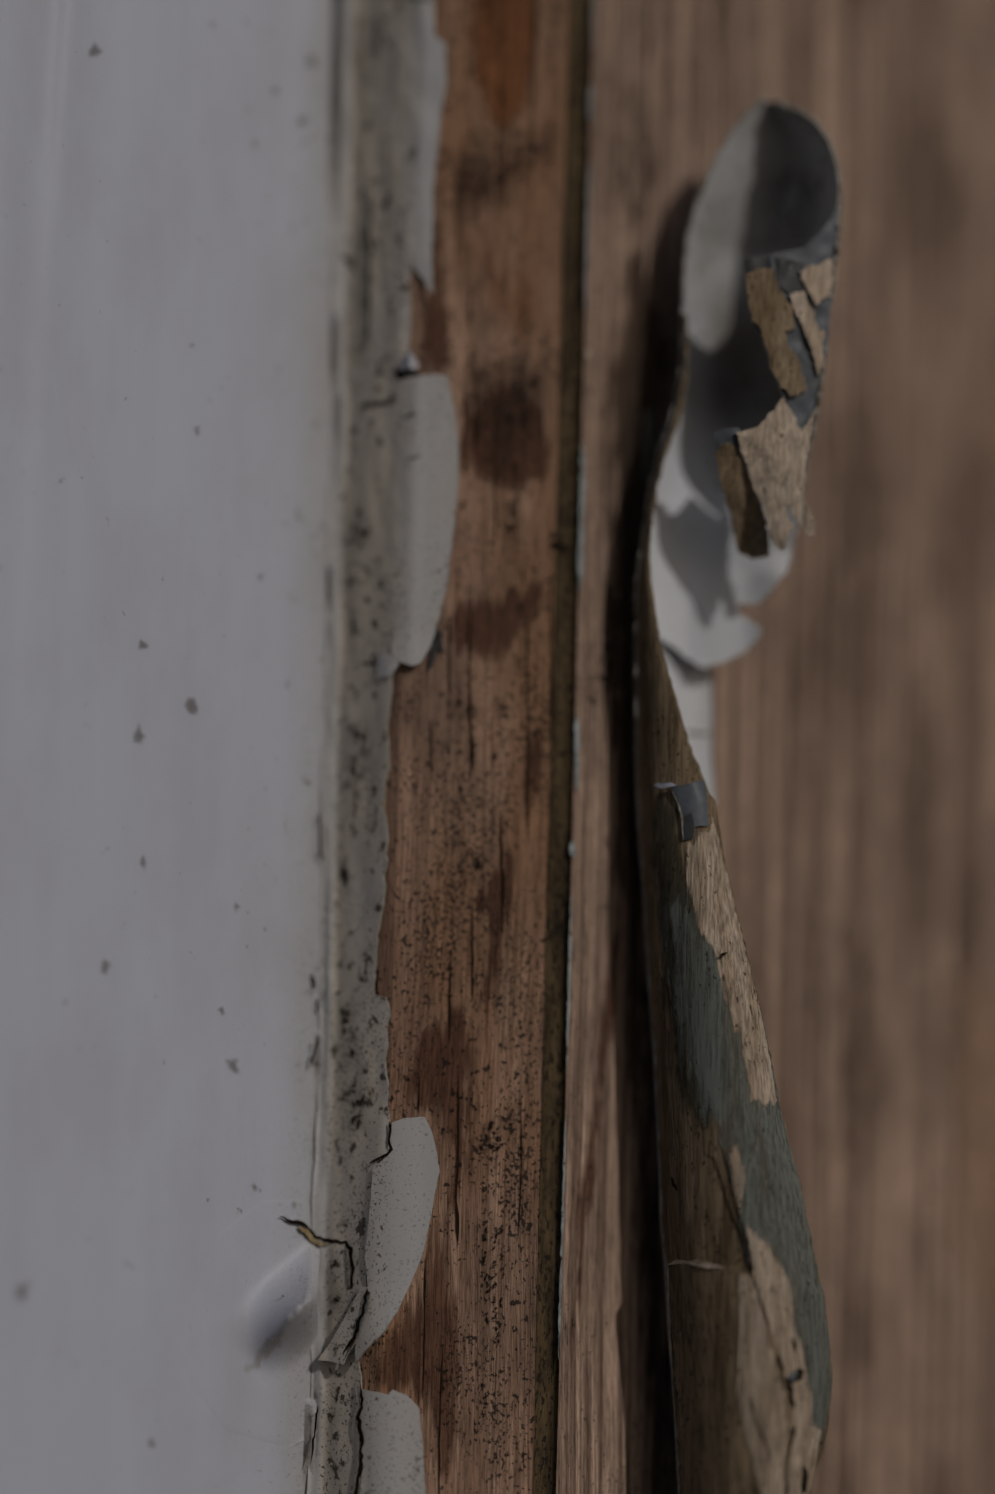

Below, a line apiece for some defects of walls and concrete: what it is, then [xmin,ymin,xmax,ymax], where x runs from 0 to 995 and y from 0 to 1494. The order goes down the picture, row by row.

peeling [409,0,447,294]
peeling [377,351,459,679]
crack [430,587,474,776]
crack [448,611,529,1042]
peeling [634,98,843,1494]
crack [310,973,318,1068]
crack [279,1216,371,1494]
peeling [318,1117,440,1364]
peeling [359,1389,426,1494]
crack [369,1073,420,1164]
crack [422,1079,460,1494]
crack [516,1097,524,1235]